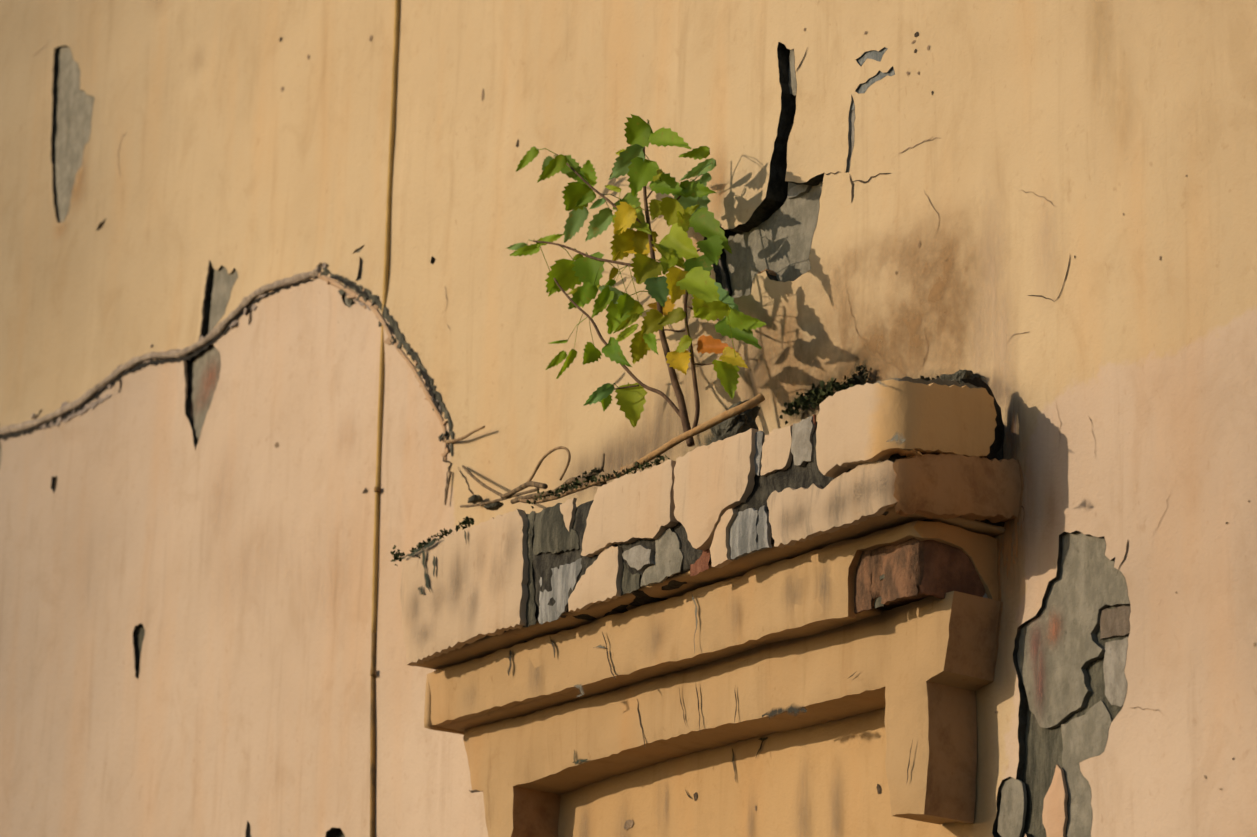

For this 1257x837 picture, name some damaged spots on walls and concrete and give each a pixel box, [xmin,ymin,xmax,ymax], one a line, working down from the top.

flaking render [51,45,95,223]
flaking render [712,42,824,298]
peeling [845,47,919,173]
flaking render [183,261,238,451]
crack [0,260,474,502]
damp [762,242,961,418]
flaking render [533,498,582,624]
flaking render [621,528,710,596]
flaking render [729,505,772,560]
flaking render [133,623,145,679]
flaking render [992,530,1131,837]
flaking render [326,827,345,837]